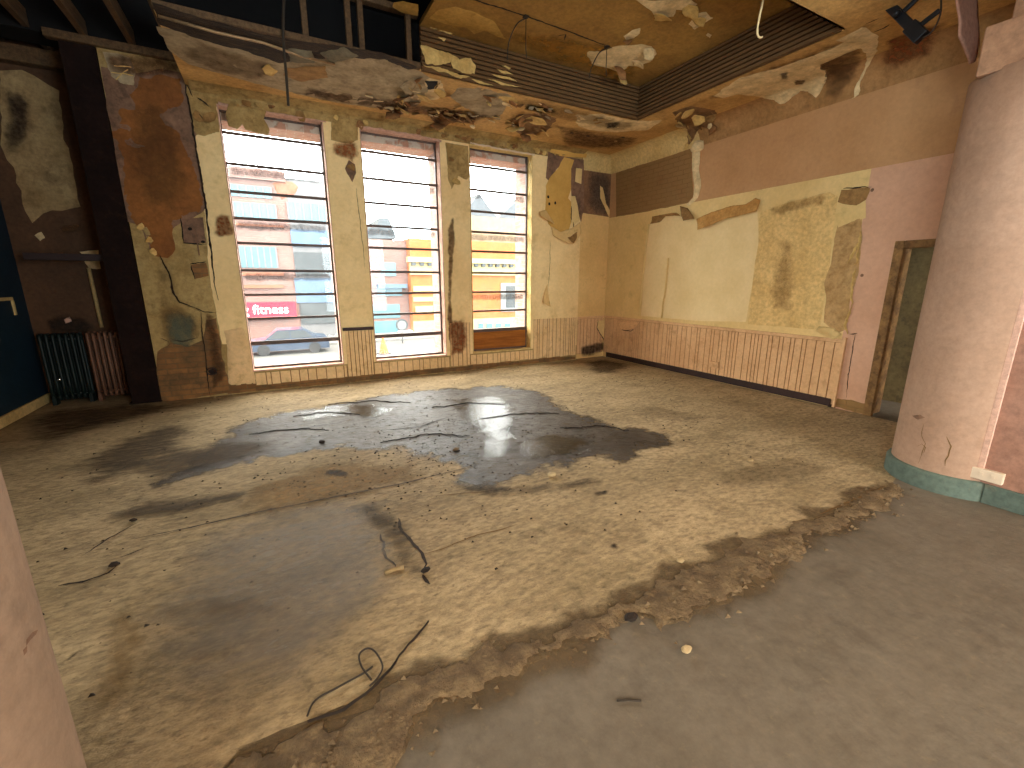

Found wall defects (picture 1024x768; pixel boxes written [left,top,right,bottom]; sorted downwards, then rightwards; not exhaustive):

spalling [715,27,879,104]
flaking render [0,70,80,223]
crack [160,84,218,394]
peeling [101,0,717,402]
leakage [447,219,466,353]
flaking render [748,186,874,334]
leakage [151,385,672,488]
crack [918,425,952,464]
spalling [228,482,905,768]